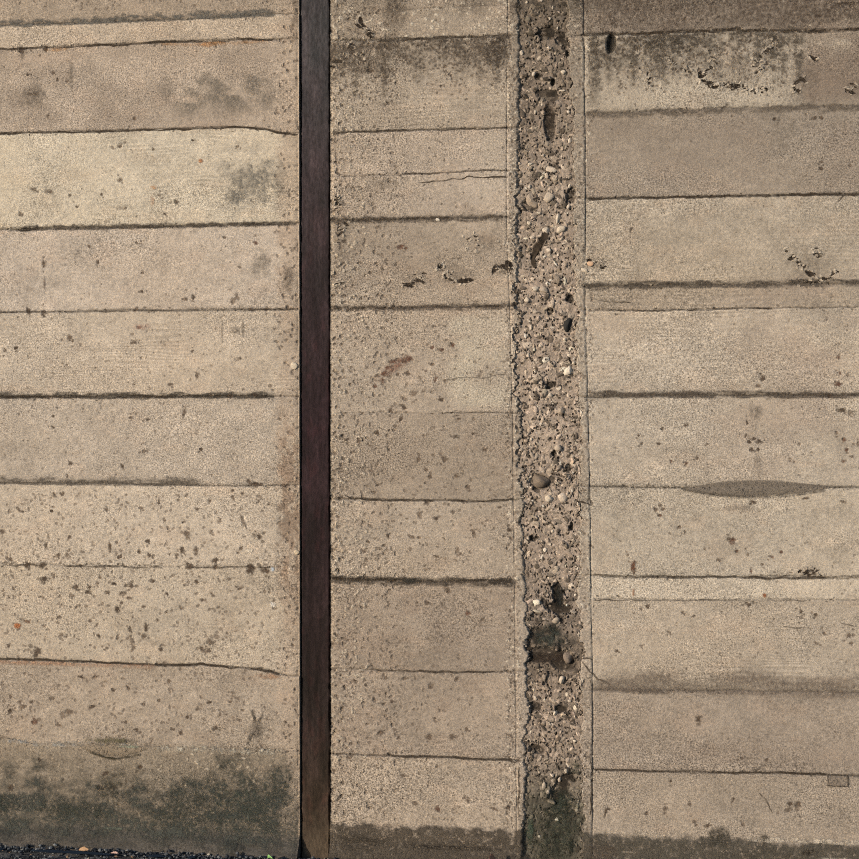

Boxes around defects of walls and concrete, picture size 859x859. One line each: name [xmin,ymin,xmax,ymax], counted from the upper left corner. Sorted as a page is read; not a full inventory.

leakage [583,0,859,87]
spalling [667,50,768,96]
spalling [785,250,839,287]
leakage [328,823,530,859]
leakage [583,829,859,859]